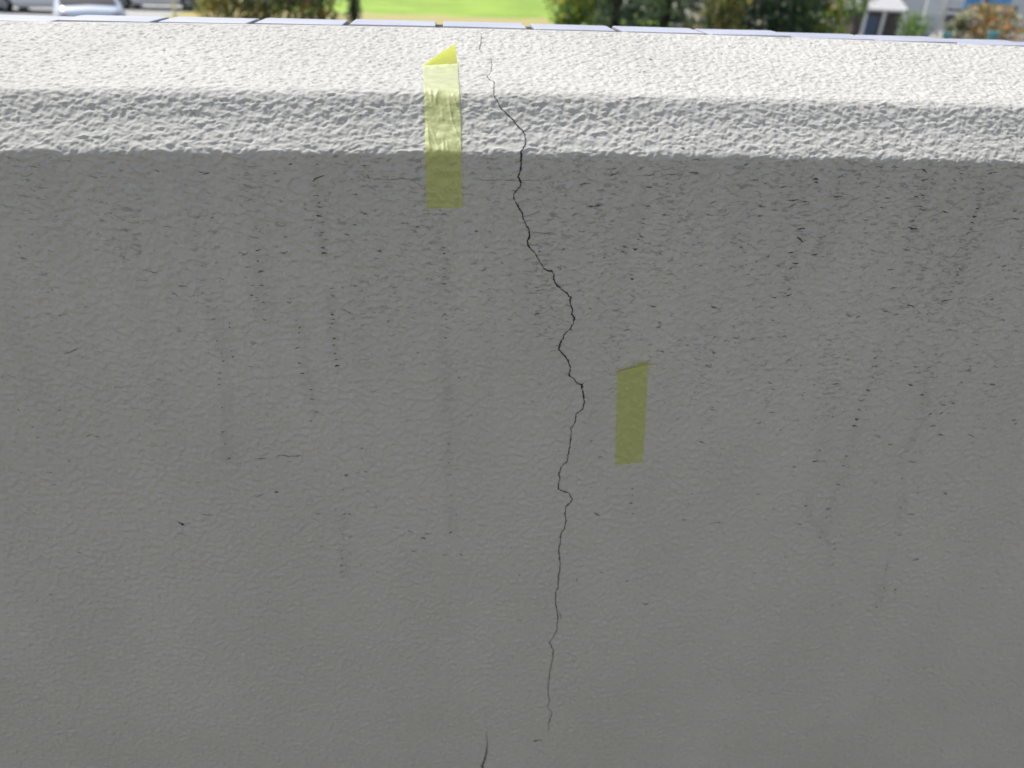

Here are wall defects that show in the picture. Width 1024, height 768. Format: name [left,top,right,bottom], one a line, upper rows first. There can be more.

crack [472,37,585,731]